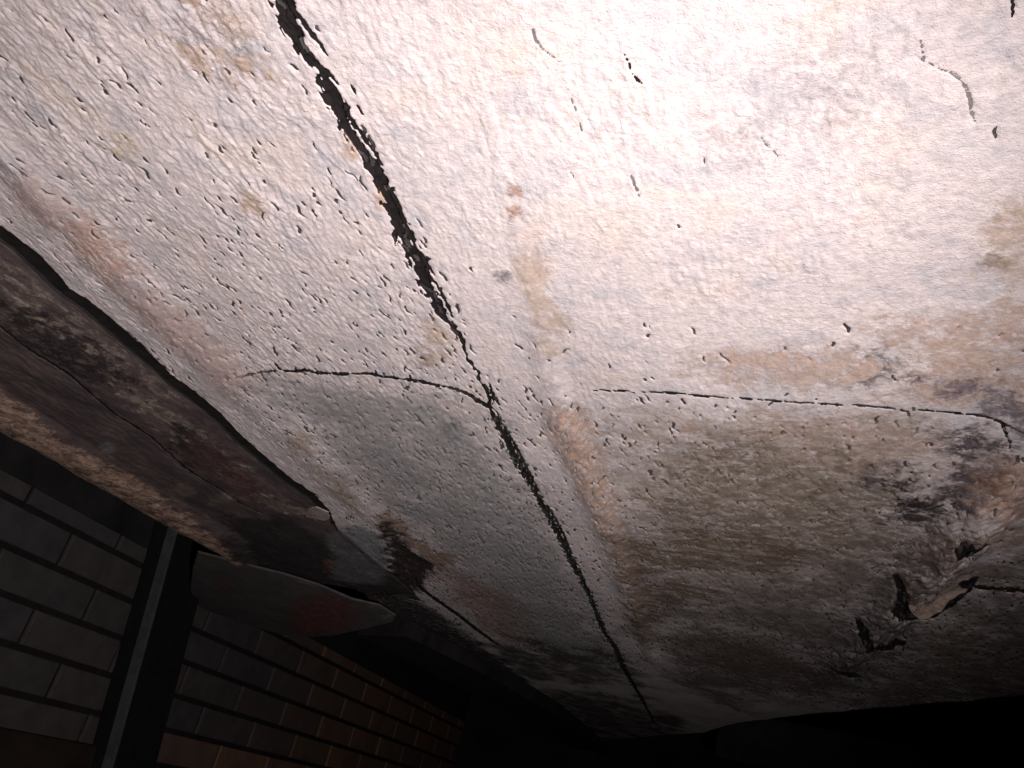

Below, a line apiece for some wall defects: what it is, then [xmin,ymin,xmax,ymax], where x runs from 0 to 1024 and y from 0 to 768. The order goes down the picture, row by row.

crack [919,40,976,122]
crack [226,0,655,724]
water stain [222,390,686,742]
crack [593,389,1017,449]
water stain [605,379,1024,711]
spalling [818,439,1024,678]